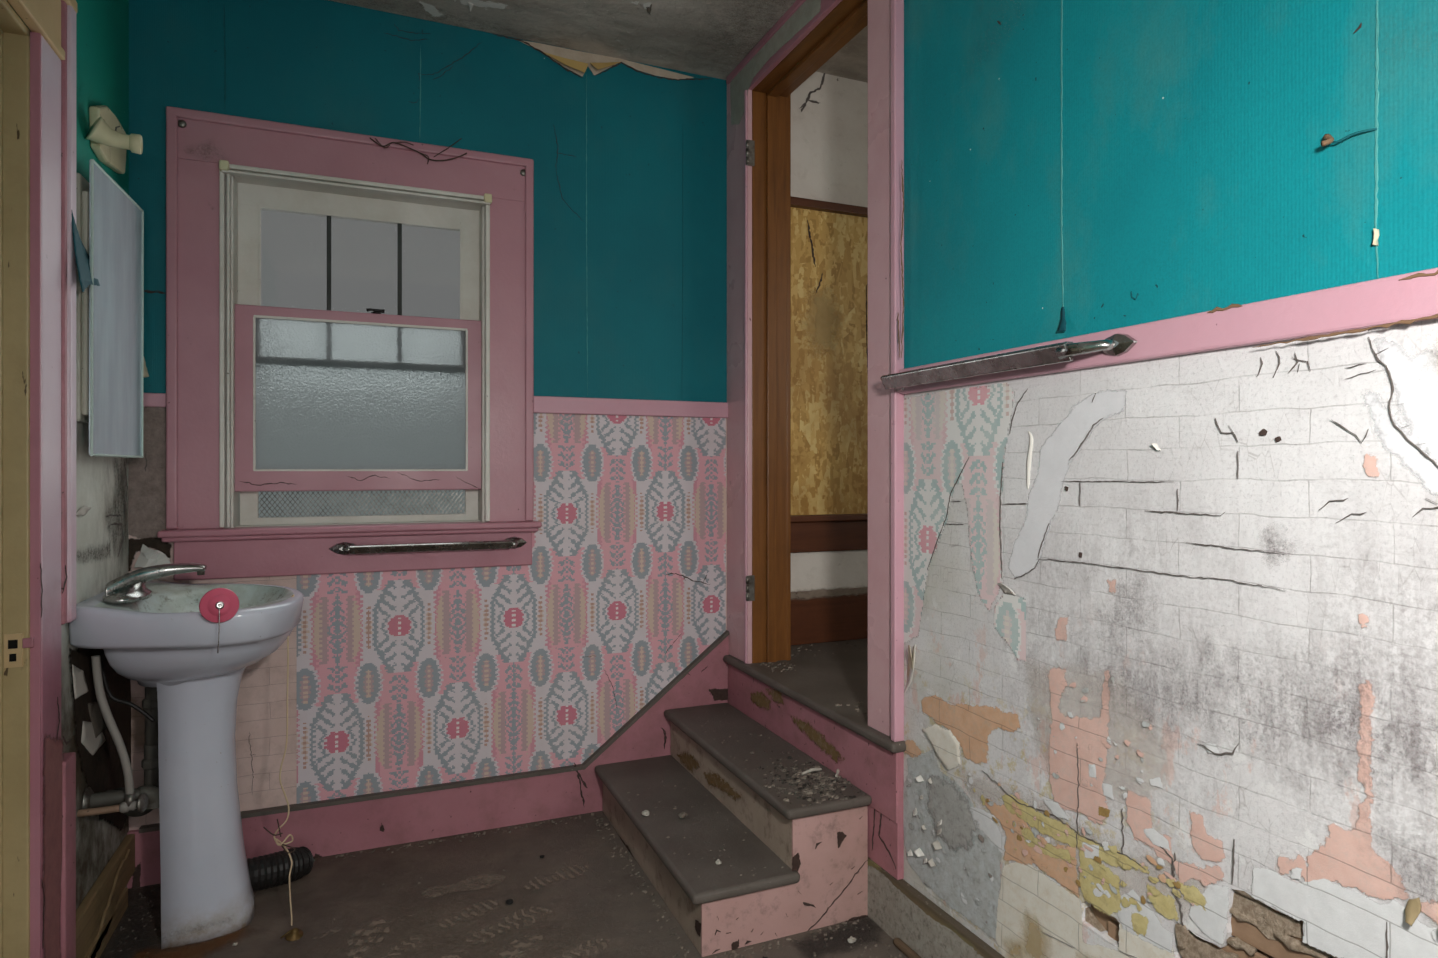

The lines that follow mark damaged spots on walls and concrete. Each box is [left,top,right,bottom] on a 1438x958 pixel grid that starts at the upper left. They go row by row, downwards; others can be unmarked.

peeling [454,0,508,11]
peeling [520,40,694,79]
peeling [1399,270,1438,280]
peeling [1207,304,1242,313]
crack [1257,351,1311,378]
crack [1332,337,1438,517]
peeling [1363,454,1380,477]
crack [1318,498,1366,523]
peeling [904,644,916,694]
peeling [905,667,1438,958]
peeling [792,853,801,872]
peeling [846,865,983,958]